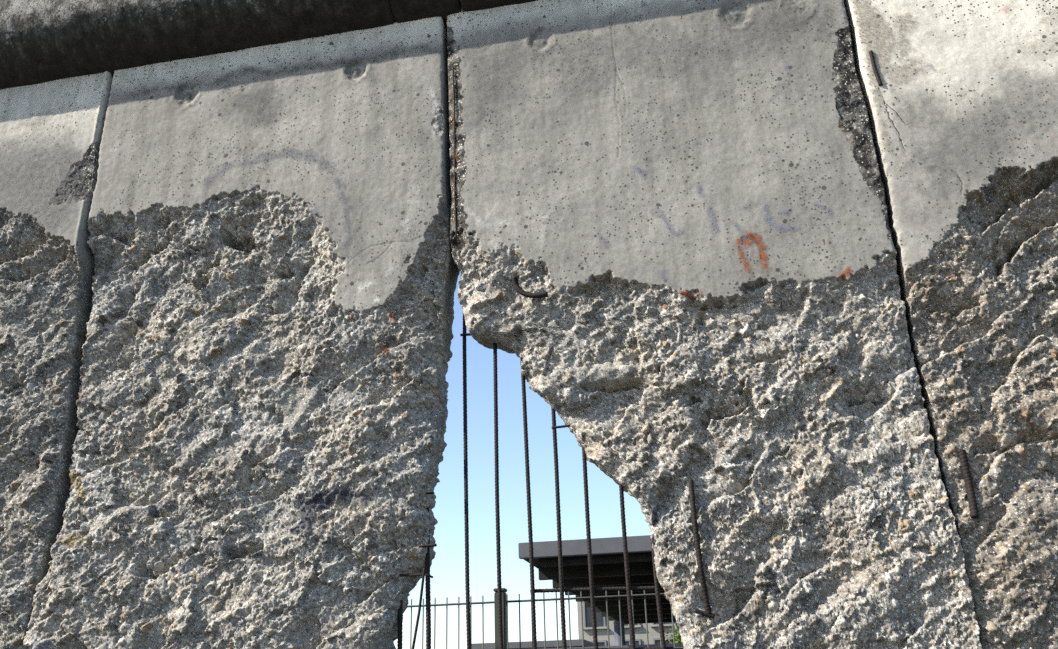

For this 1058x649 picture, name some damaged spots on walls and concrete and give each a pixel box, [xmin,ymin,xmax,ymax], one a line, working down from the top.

spalling [0,26,469,649]
spalling [450,157,1058,649]
spalling [831,0,922,240]